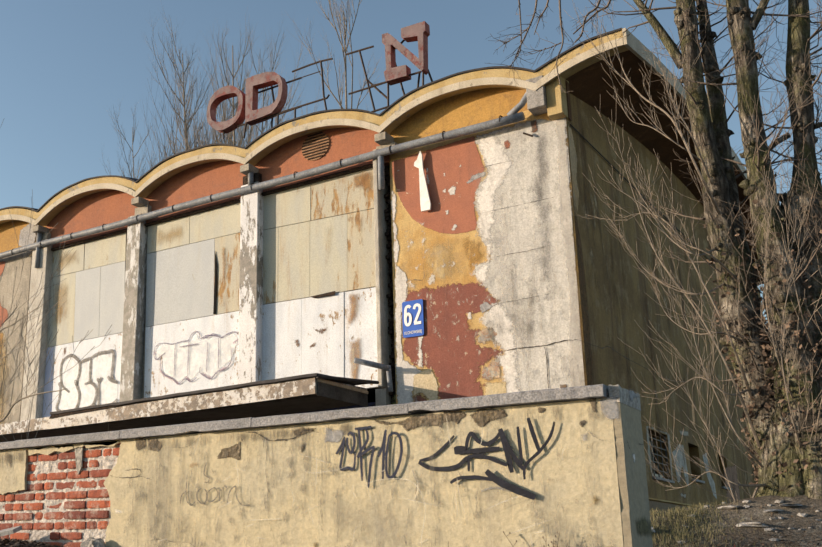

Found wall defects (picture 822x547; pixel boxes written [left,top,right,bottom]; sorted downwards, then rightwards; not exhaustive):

corrosion [354,173,372,189]
peeling [466,117,579,395]
peeling [391,191,438,404]
peeling [49,404,130,419]
spalling [376,408,507,431]
peeling [589,397,619,419]
spalling [217,442,241,460]
flaking render [0,440,121,547]